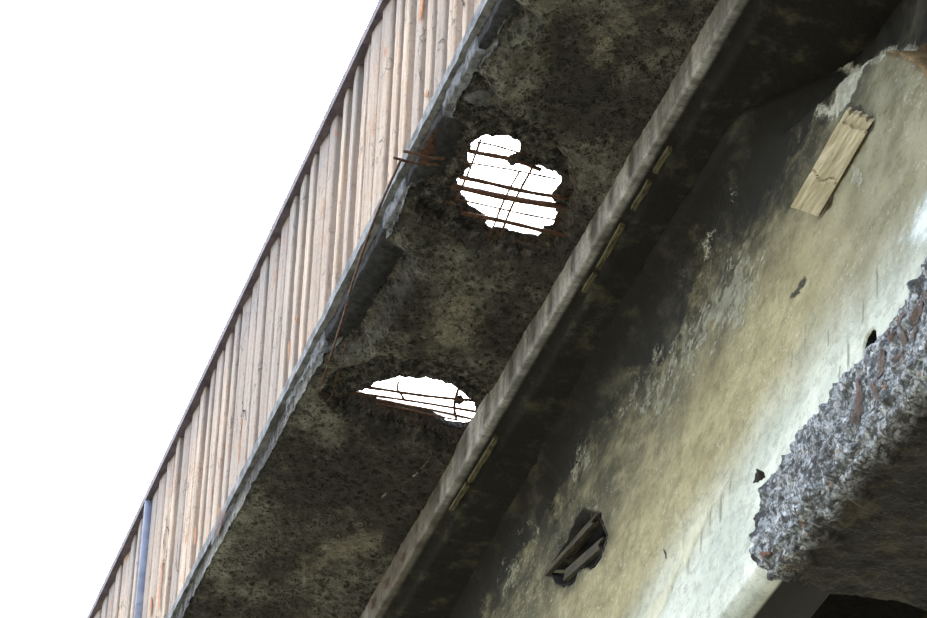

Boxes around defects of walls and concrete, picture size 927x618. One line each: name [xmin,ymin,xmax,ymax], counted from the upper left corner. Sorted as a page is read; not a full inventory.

damp [818,47,916,120]
spalling [319,150,490,422]
rust [852,292,927,426]
spalling [753,469,766,483]
spalling [544,508,608,586]
damp [647,483,730,618]